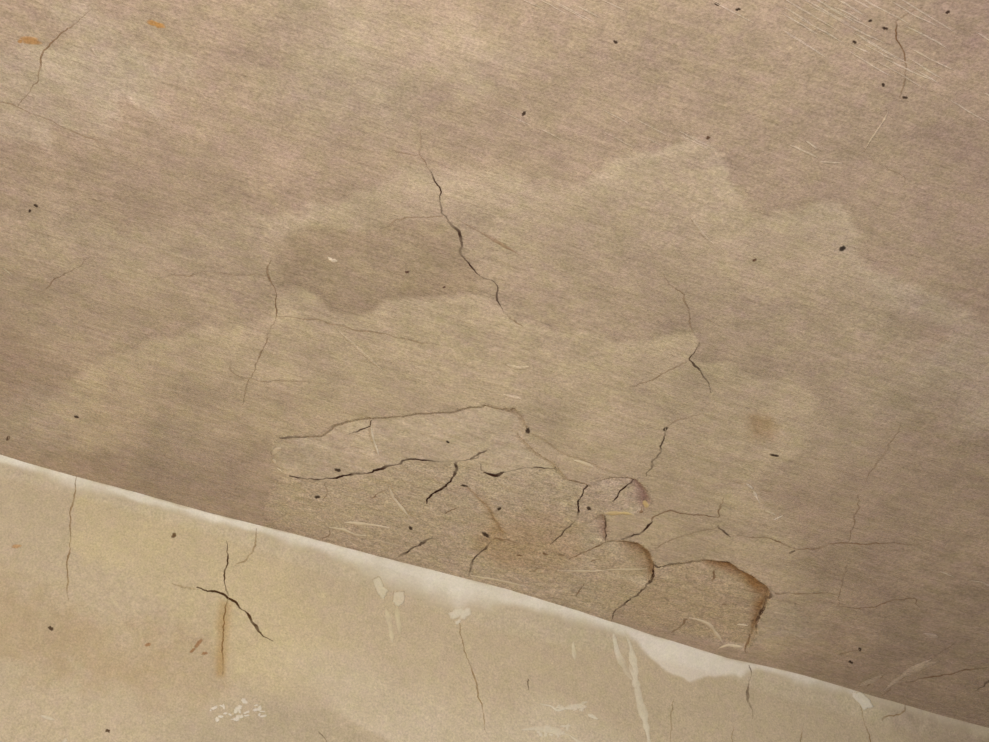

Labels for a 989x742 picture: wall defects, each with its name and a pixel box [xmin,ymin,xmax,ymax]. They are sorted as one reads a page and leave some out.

crack [381,130,526,328]
crack [163,261,442,403]
crack [66,477,77,600]
corrosion [190,596,238,682]
crack [172,528,273,675]
spalling [0,402,989,740]
crack [860,643,989,742]